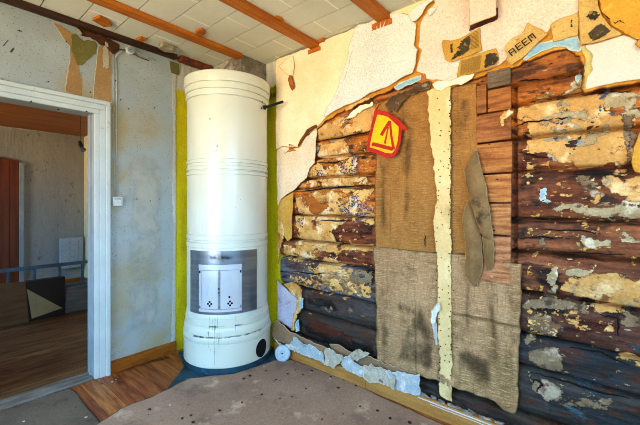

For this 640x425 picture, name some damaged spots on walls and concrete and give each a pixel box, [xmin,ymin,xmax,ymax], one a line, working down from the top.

peeling [500,71,640,221]
peeling [281,100,379,332]
peeling [576,227,612,251]
peeling [619,231,640,247]
damp [416,312,431,366]
peeling [522,266,640,372]
damp [461,354,487,380]
peeling [529,377,614,410]